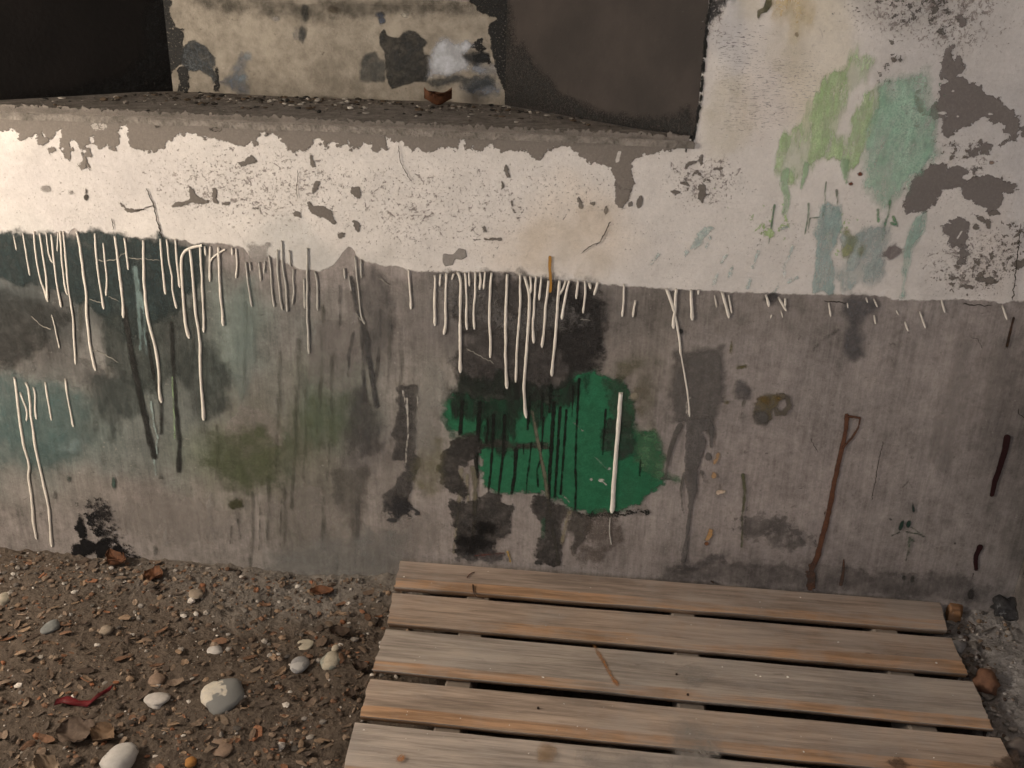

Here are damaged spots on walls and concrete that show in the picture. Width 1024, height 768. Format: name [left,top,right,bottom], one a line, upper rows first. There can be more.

peeling [0,0,694,214]
spalling [669,154,723,203]
peeling [293,181,361,239]